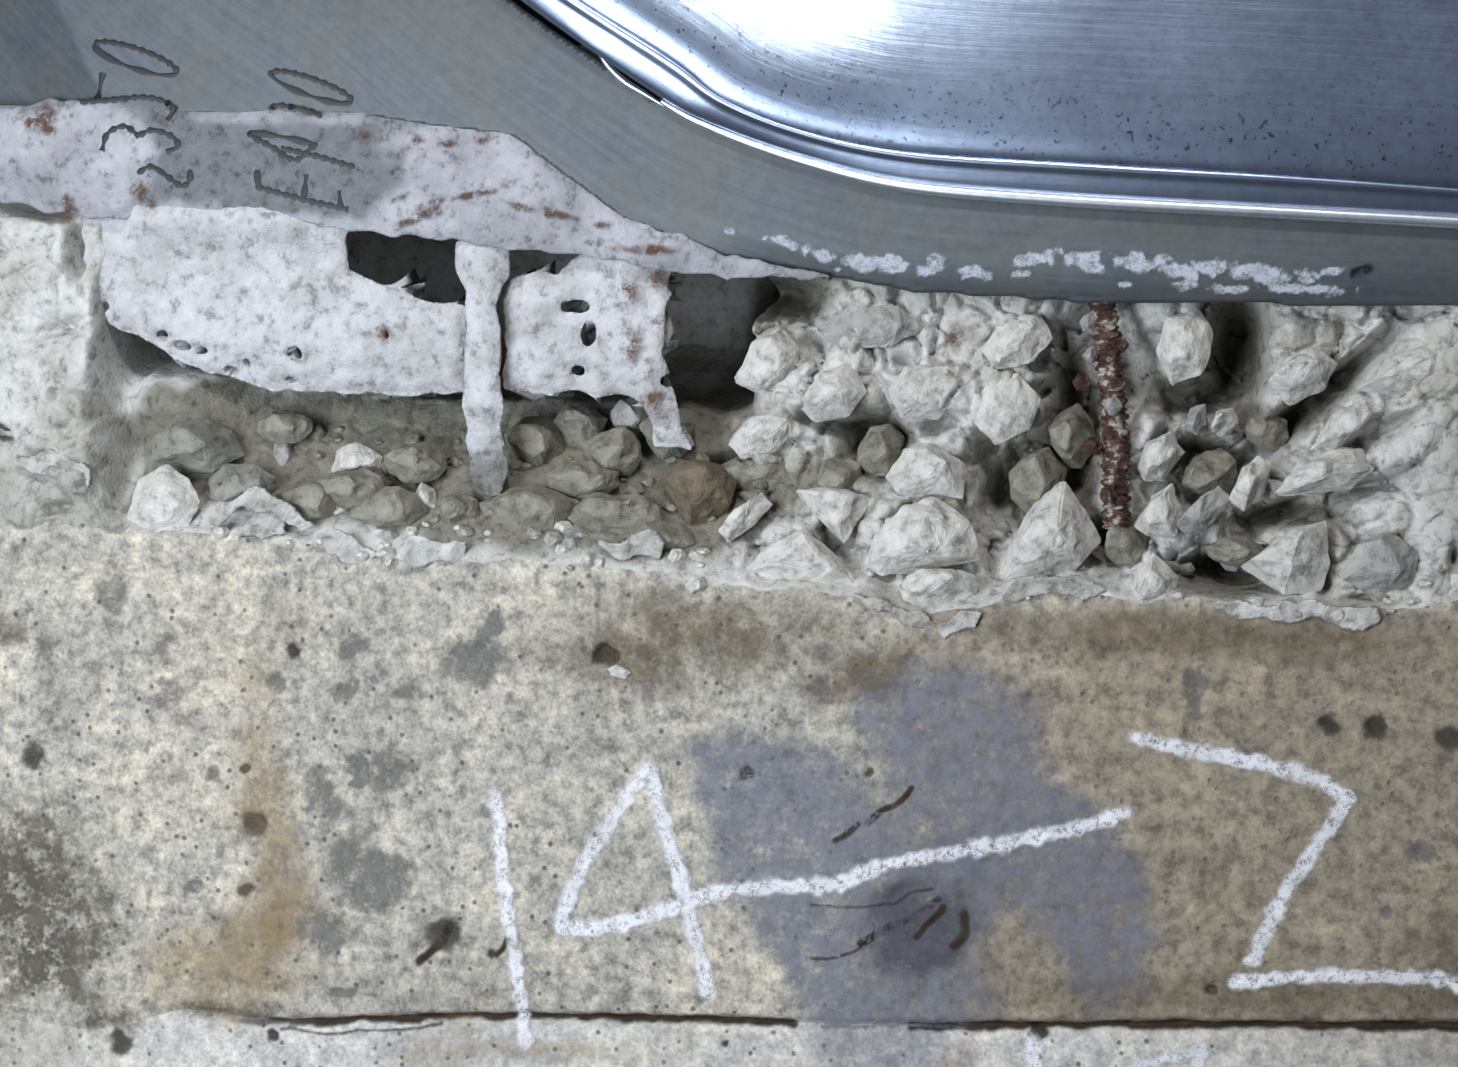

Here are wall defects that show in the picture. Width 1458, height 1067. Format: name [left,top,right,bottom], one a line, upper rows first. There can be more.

spalling [576,45,602,63]
spalling [0,202,1458,640]
rust [1072,301,1132,529]
damp [604,602,766,682]
crack [259,1012,798,1035]
crack [908,1019,1458,1032]